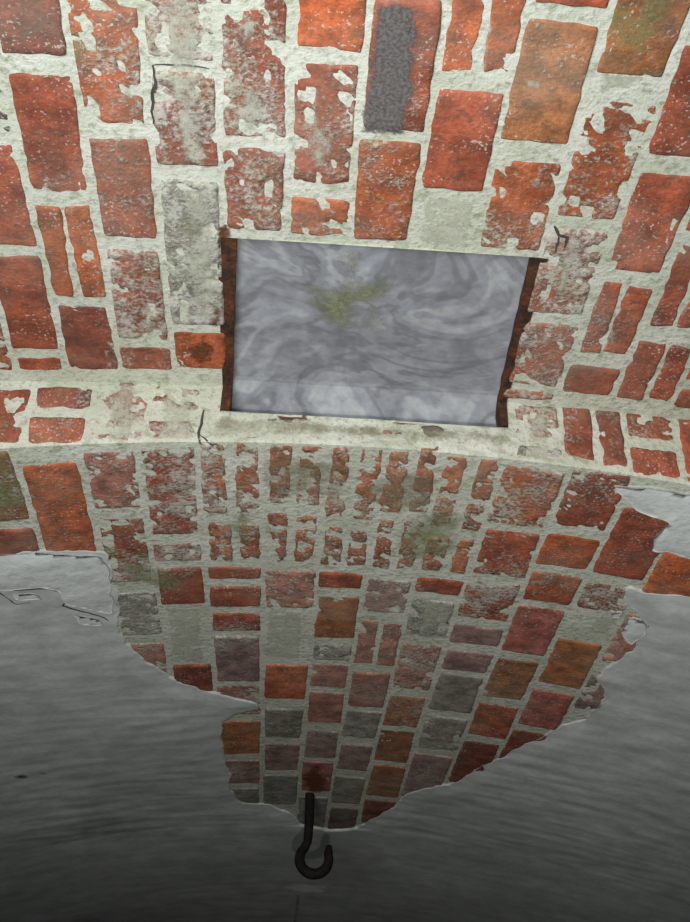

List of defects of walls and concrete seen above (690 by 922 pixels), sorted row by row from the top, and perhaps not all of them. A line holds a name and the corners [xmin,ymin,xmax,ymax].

crack [150,64,209,124]
peeling [168,0,207,163]
crack [197,410,220,446]
flaking render [0,419,690,832]